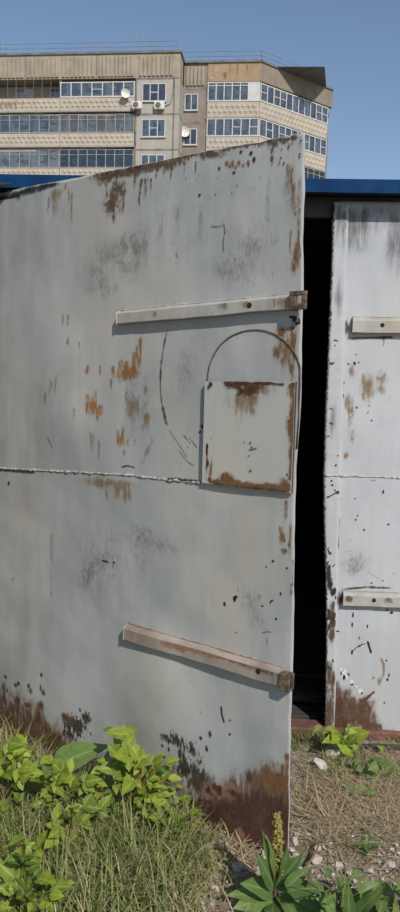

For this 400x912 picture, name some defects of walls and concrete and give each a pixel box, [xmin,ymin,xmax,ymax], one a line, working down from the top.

rust [90,135,297,222]
rust [287,165,301,271]
rust [86,390,103,420]
rust [111,338,142,385]
rust [206,326,296,564]
rust [95,478,130,501]
rust [327,659,385,730]
rust [163,753,289,854]